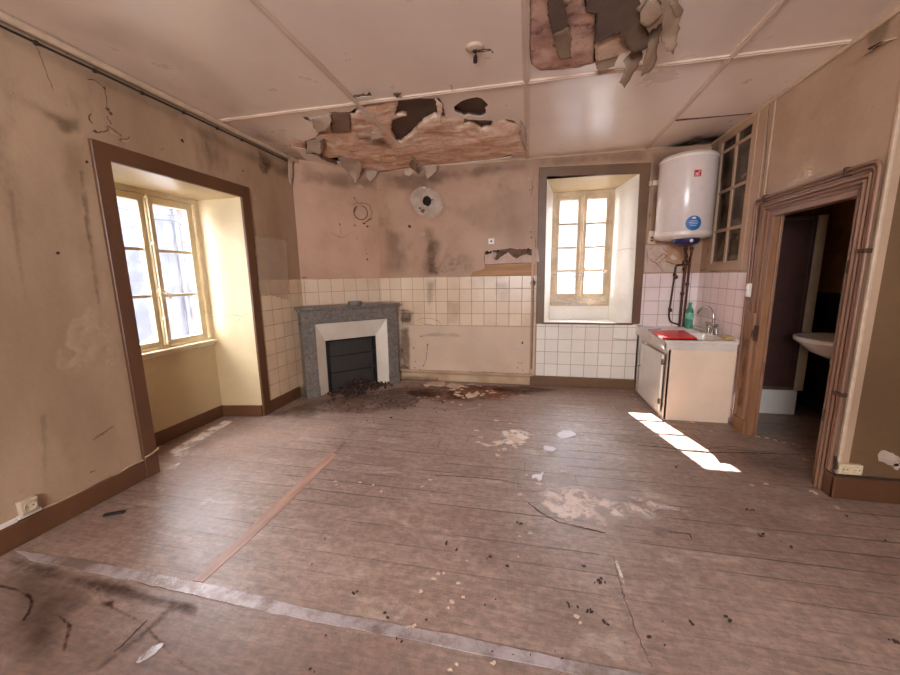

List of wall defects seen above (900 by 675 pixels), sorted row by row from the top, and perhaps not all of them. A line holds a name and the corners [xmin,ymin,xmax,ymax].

crack [87,79,130,142]
spalling [484,247,535,265]